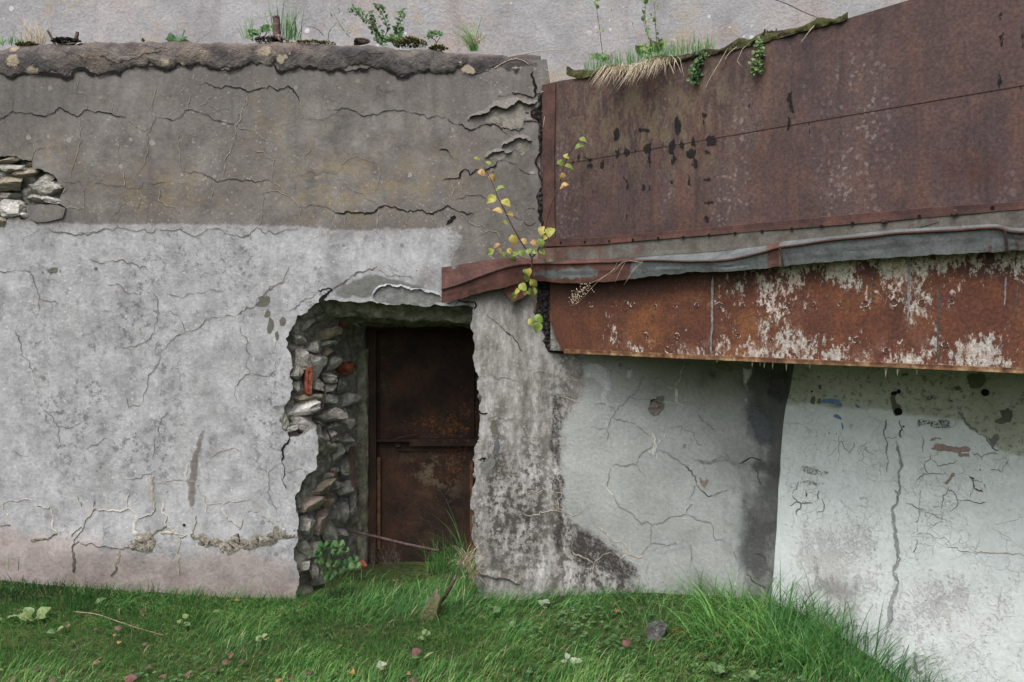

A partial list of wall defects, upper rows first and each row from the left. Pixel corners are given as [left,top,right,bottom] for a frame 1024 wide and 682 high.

flaking render [467,97,538,160]
spalling [0,156,66,227]
crack [0,45,538,577]
flaking render [337,275,442,307]
damp [550,394,638,577]
crack [477,362,766,588]
damp [742,517,771,576]
damp [753,462,781,477]
crack [790,482,825,515]
crack [838,405,1024,641]